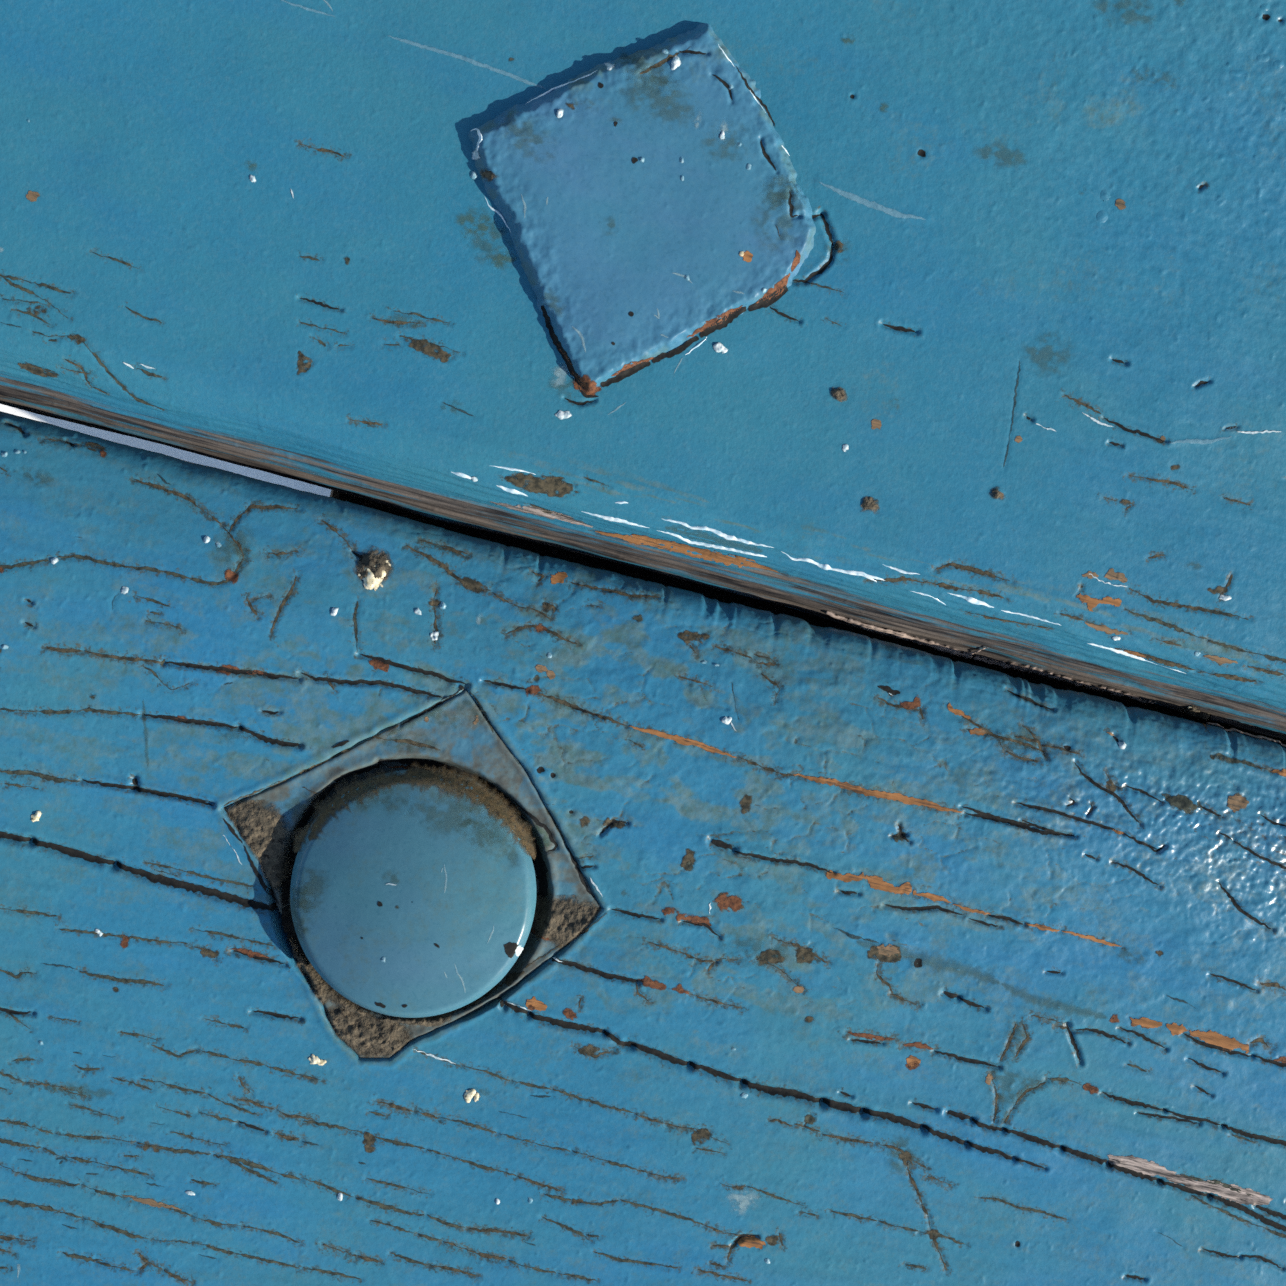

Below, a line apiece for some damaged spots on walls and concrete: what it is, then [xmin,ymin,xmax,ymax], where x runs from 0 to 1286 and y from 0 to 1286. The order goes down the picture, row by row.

crack [301,144,345,157]
crack [95,253,133,267]
crack [0,274,163,410]
crack [300,298,350,346]
corrosion [555,367,601,405]
crack [0,475,362,632]
crack [0,540,1286,1283]
peeling [826,870,1122,947]